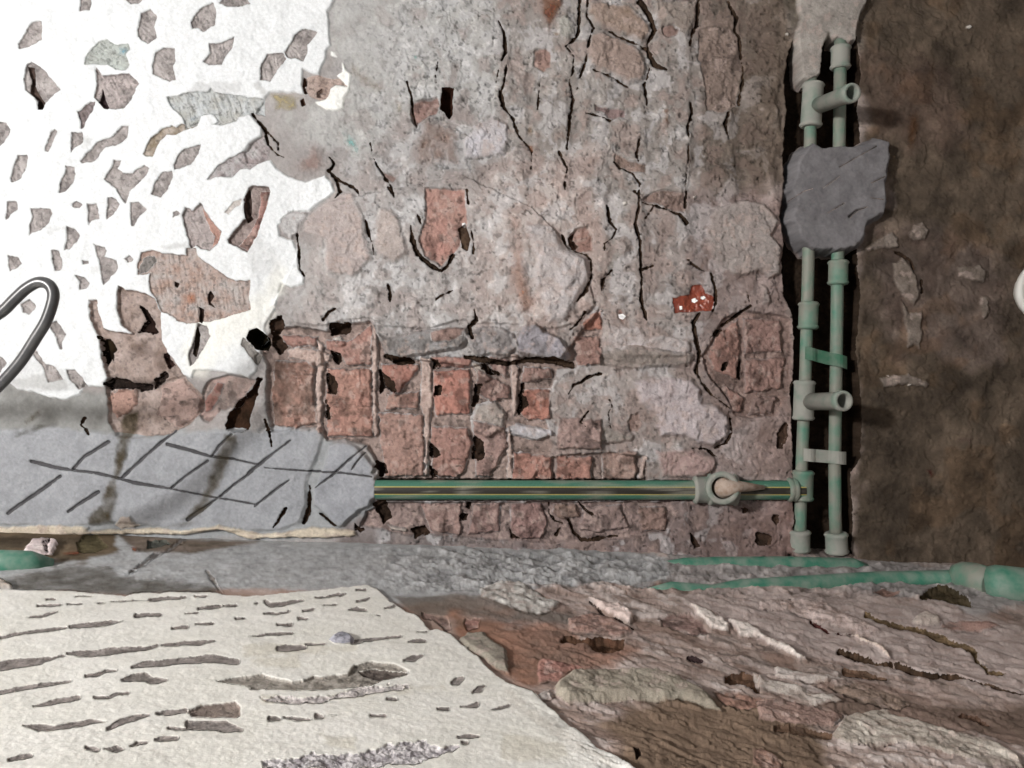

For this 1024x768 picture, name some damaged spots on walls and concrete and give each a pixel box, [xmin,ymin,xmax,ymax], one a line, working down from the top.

peeling [23,62,60,110]
peeling [58,0,176,193]
crack [496,20,541,170]
crack [558,0,667,190]
peeling [51,88,271,271]
spalling [75,185,648,480]
crack [409,214,475,301]
crack [464,309,602,394]
crack [561,102,693,330]
spalling [701,311,793,449]
spalling [354,500,676,544]
crack [810,611,1023,696]